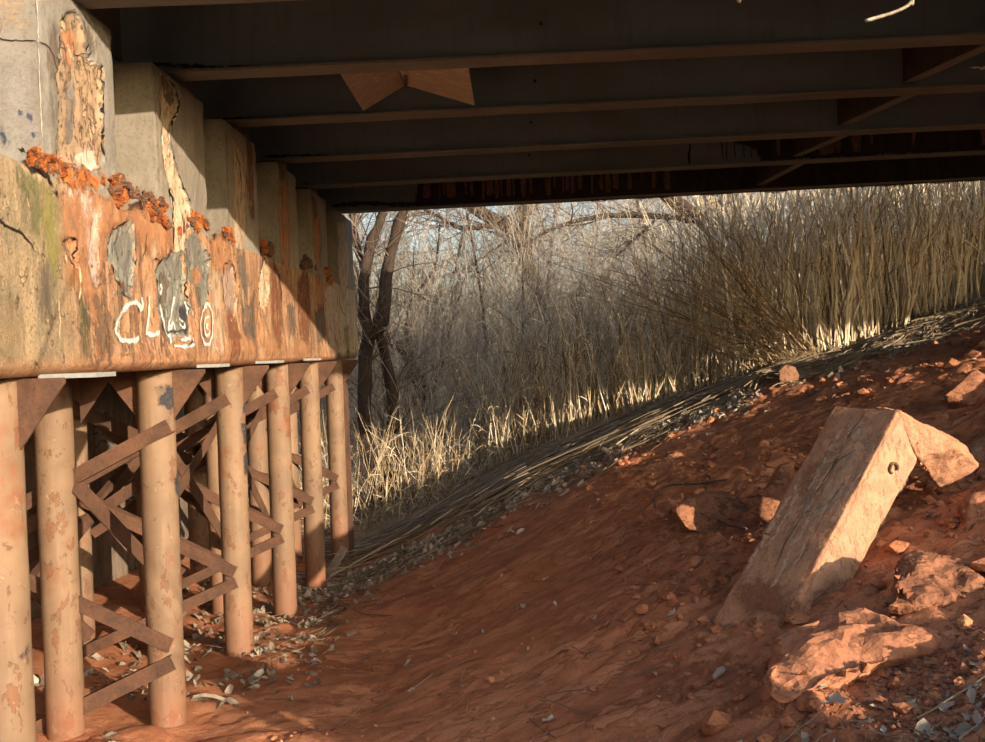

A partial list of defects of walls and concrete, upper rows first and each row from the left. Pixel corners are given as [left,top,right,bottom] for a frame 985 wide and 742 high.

crack [0,38,91,71]
spalling [55,11,107,171]
crack [0,217,36,254]
rust [18,144,173,358]
spalling [62,217,138,364]
spalling [154,72,236,339]
rust [186,209,236,246]